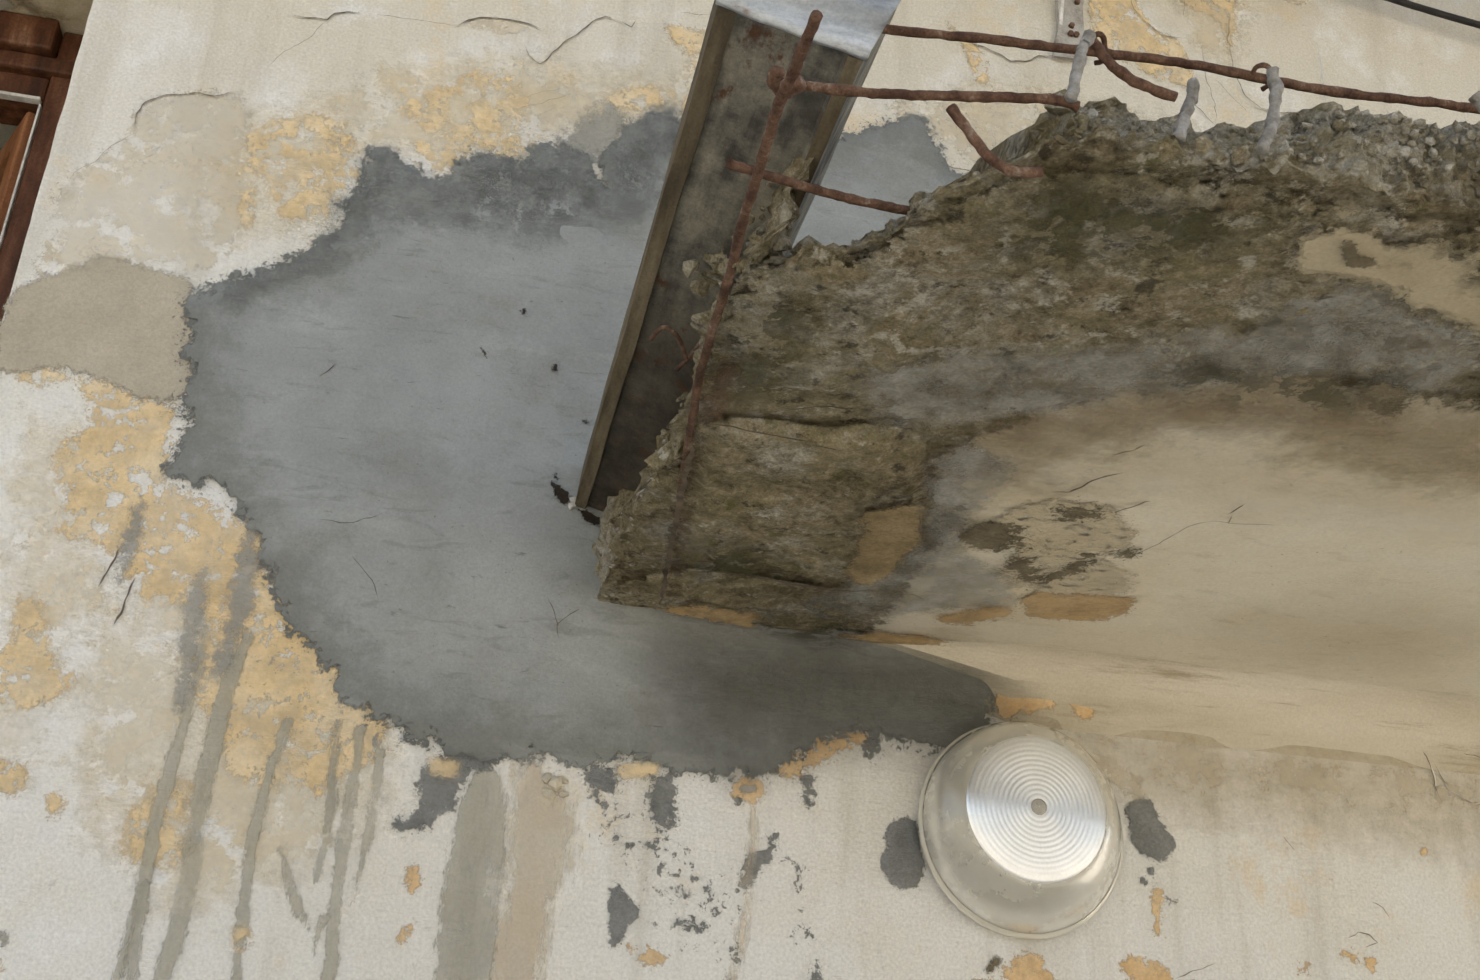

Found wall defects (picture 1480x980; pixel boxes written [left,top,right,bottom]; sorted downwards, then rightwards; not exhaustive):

crack [272,8,636,65]
peeling [237,111,360,227]
spalling [607,0,1480,646]
flaking render [0,254,394,798]
water stain [113,532,262,980]
water stain [231,718,293,980]
water stain [279,719,385,980]
water stain [433,760,574,980]
peeling [626,876,749,980]
water stain [709,607,977,719]
peeling [972,949,1055,980]
peeling [1119,954,1173,980]